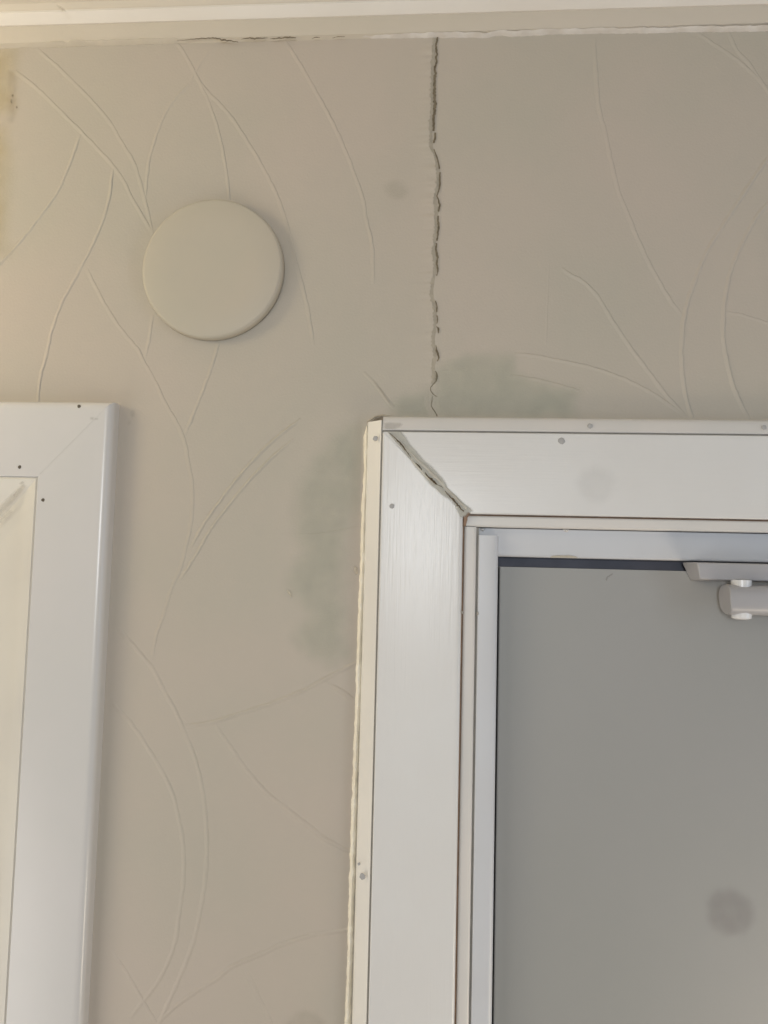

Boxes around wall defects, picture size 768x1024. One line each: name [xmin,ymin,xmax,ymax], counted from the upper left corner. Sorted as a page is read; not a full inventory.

crack [177,35,345,43]
crack [408,37,441,416]